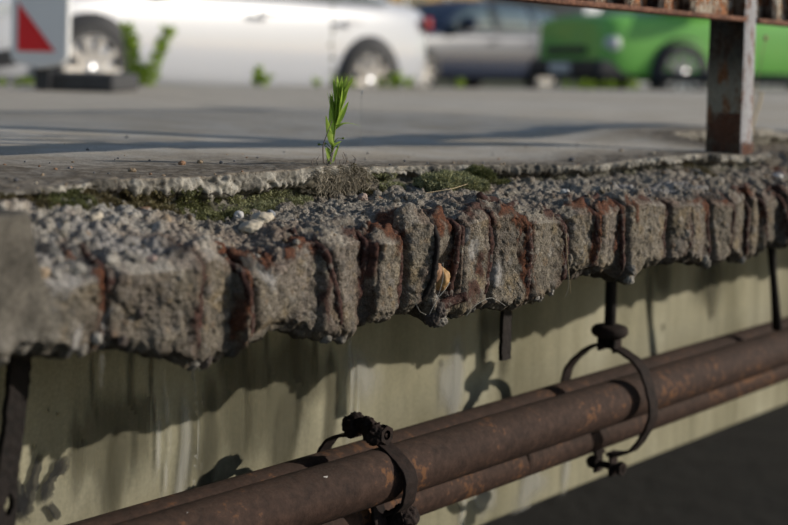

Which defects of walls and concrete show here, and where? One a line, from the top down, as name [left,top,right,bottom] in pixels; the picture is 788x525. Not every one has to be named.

corrosion [709,112,754,155]
corrosion [213,240,275,289]
corrosion [342,208,406,297]
spalling [0,141,788,371]
corrosion [462,199,537,305]
corrosion [565,194,671,265]
corrosion [735,185,763,220]
corrosion [229,300,252,345]
damp [78,353,168,511]
damp [178,409,195,492]